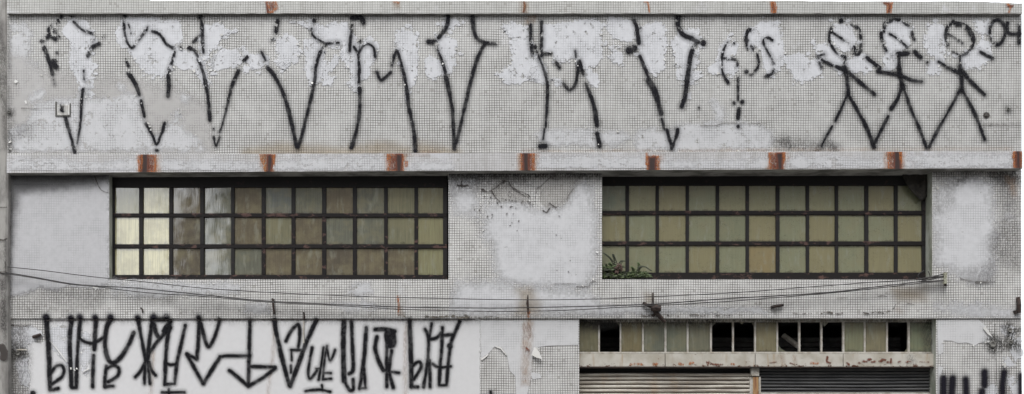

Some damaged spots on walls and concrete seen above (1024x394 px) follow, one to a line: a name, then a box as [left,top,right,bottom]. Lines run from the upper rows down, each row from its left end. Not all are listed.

peeling [494,16,994,99]
corrosion [138,154,157,172]
corrosion [259,154,275,172]
corrosion [386,154,408,171]
corrosion [520,153,535,170]
corrosion [646,155,660,170]
corrosion [768,152,786,169]
corrosion [887,152,902,169]
corrosion [1013,151,1022,168]
crack [481,179,548,202]
peeling [0,16,766,394]